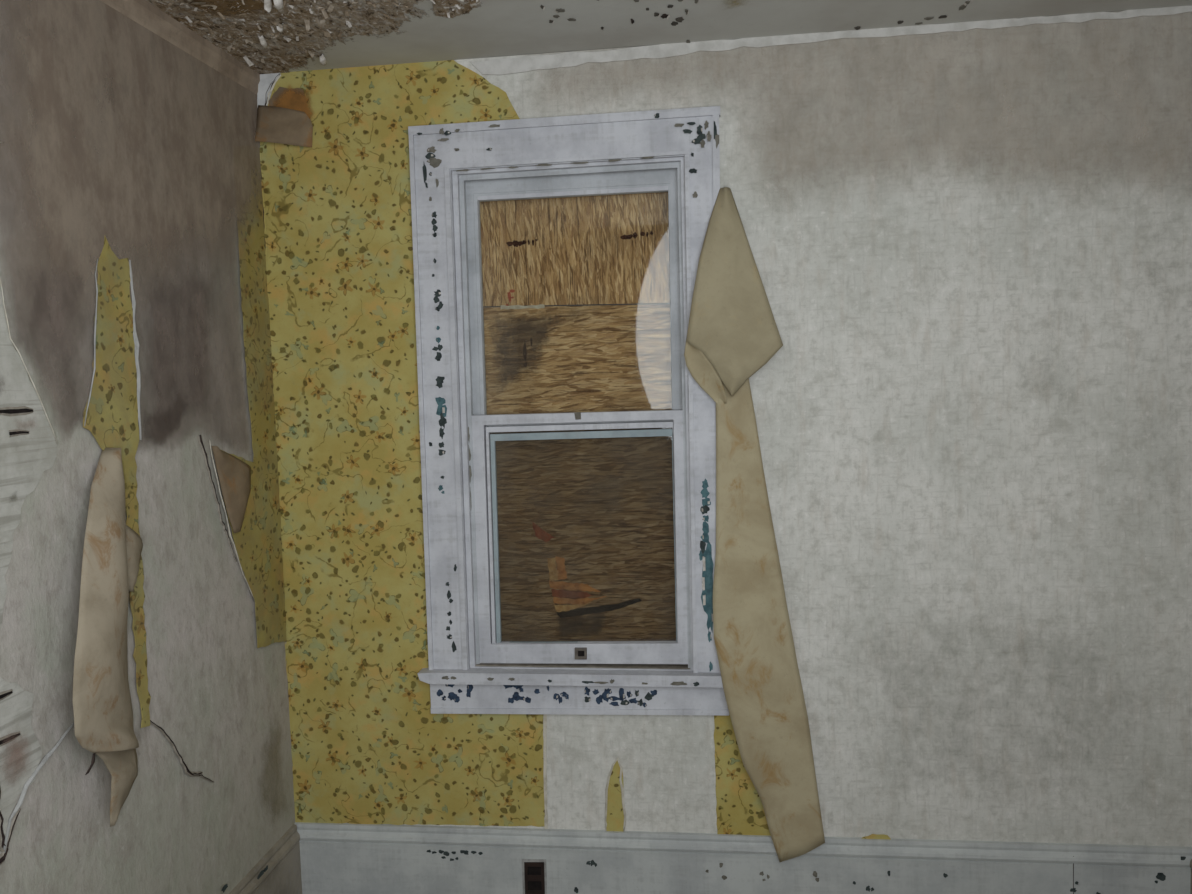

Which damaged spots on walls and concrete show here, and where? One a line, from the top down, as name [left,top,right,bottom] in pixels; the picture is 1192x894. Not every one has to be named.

peeling [146,0,481,147]
flaking render [470,0,1192,75]
water stain [0,0,273,448]
peeling [422,128,460,237]
peeling [675,120,719,173]
peeling [0,268,58,629]
peeling [429,376,447,456]
peeling [699,479,714,642]
peeling [487,677,569,704]
peeling [582,679,657,707]
peeling [0,677,42,836]
crack [150,720,214,782]